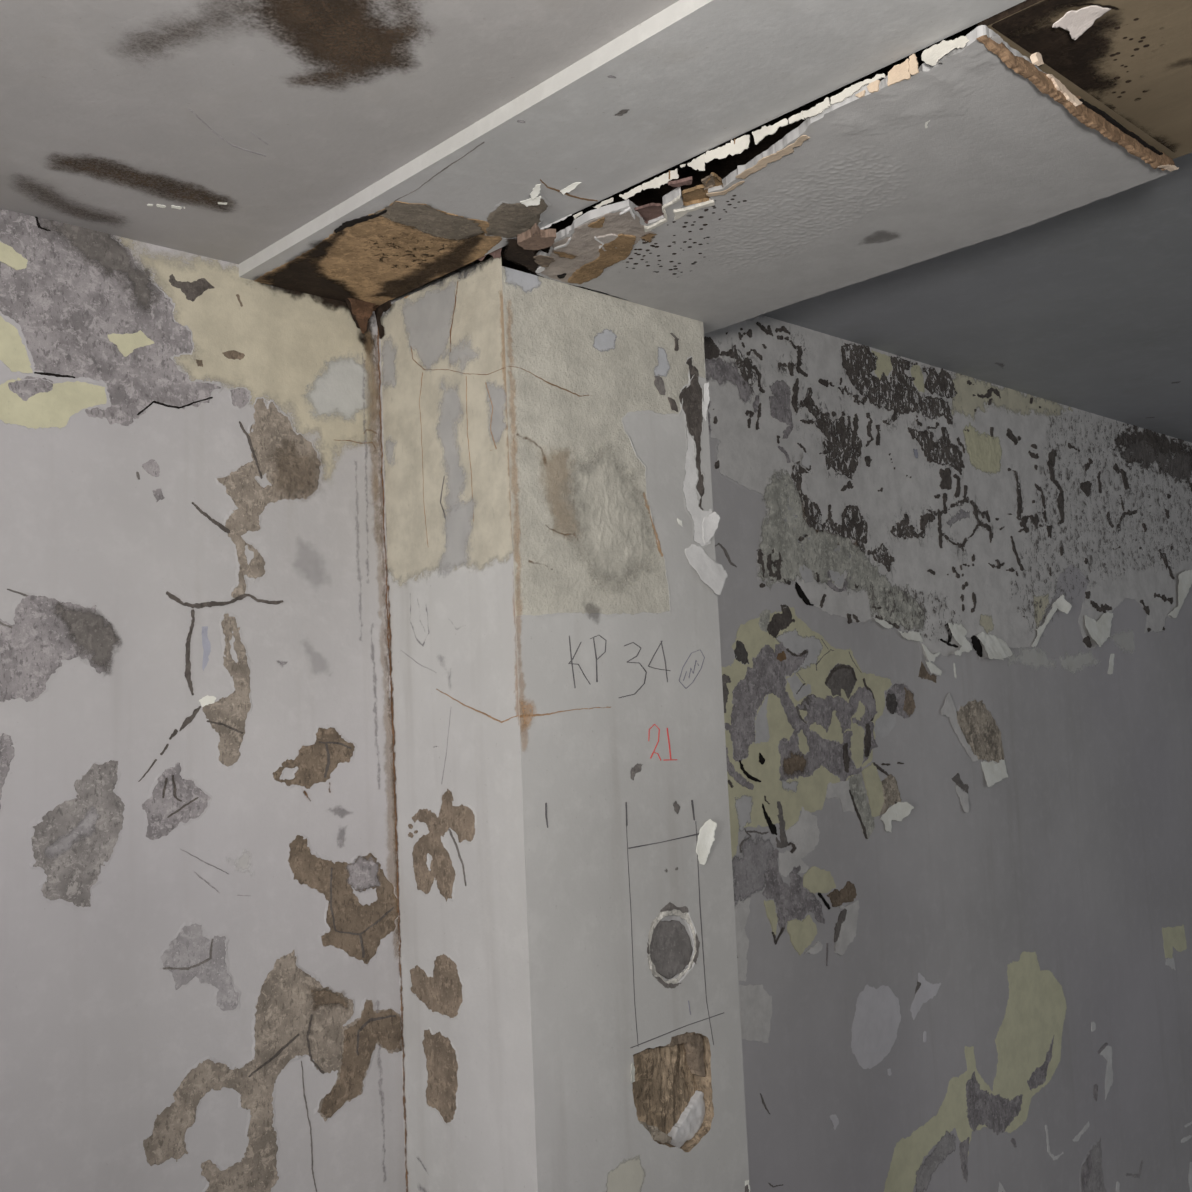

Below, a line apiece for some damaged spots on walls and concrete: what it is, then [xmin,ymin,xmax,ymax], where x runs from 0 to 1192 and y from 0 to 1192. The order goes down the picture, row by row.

water stain [133,0,420,88]
water stain [991,0,1149,108]
water stain [52,155,232,210]
crack [540,179,598,202]
water stain [255,231,481,311]
water stain [359,313,375,354]
spalling [0,208,324,770]
peeling [654,315,1192,966]
crack [138,706,201,782]
spalling [27,756,213,911]
spalling [284,831,398,968]
spalling [137,918,402,1192]